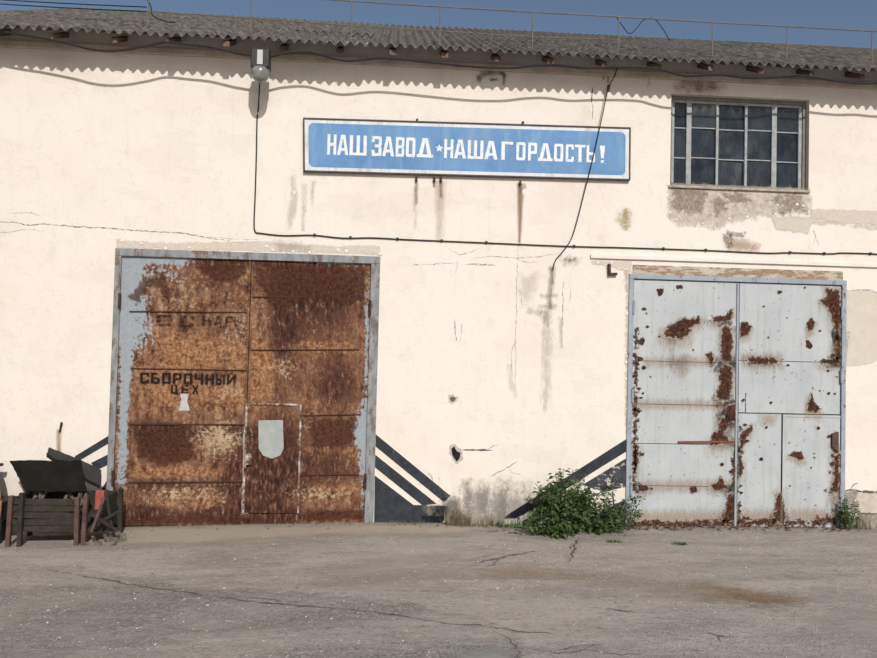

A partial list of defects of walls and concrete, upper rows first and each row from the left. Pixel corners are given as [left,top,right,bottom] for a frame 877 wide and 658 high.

crack [1,212,249,243]
flaking render [668,188,839,234]
rust [819,288,841,378]
rust [631,309,837,527]
spalling [449,444,463,464]
rust [823,454,841,494]